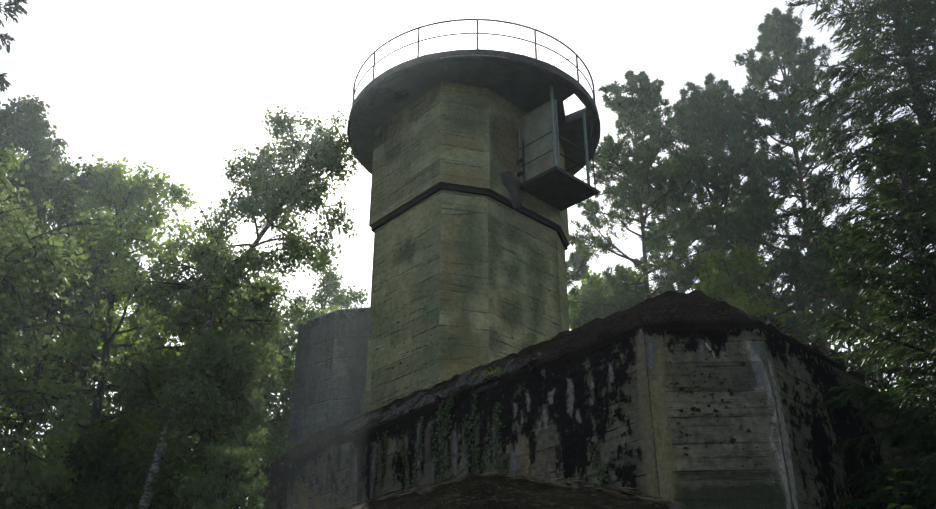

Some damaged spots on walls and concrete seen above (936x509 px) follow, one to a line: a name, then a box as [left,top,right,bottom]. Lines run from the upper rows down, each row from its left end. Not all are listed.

damp [303,309,366,367]
damp [259,329,884,509]